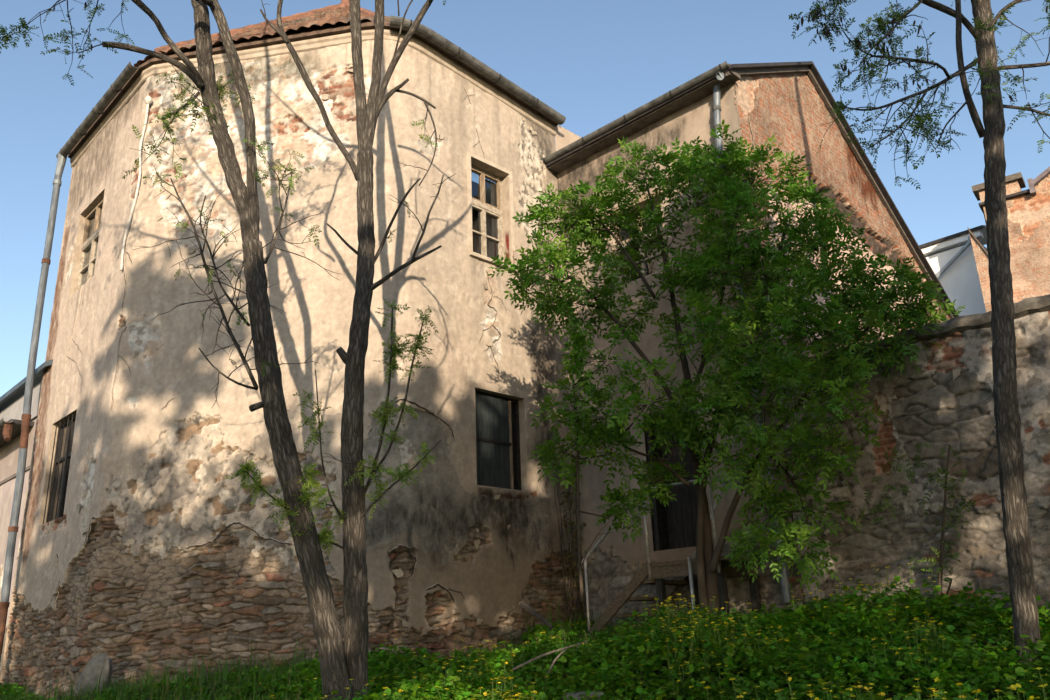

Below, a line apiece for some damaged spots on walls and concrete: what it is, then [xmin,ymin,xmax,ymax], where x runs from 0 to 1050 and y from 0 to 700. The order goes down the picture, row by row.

peeling [130,68,239,261]
peeling [215,53,371,187]
peeling [517,116,546,240]
crack [479,271,505,374]
spalling [0,395,319,700]
peeling [297,451,344,646]
peeling [363,397,691,663]
spalling [720,519,803,619]
spalling [813,334,1012,634]
spalling [1027,502,1050,627]